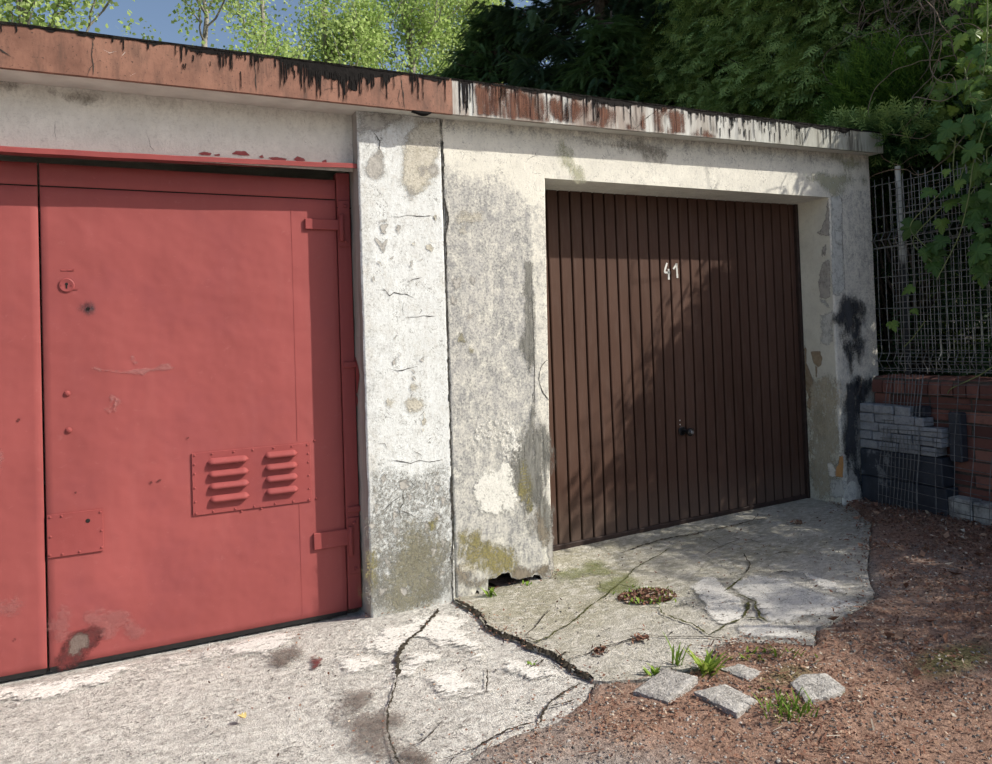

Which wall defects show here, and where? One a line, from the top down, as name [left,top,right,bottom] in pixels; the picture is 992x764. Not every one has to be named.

rust [474,83,712,137]
peeling [366,150,384,179]
flaking render [402,120,443,200]
leakage [519,261,536,373]
flaking render [804,203,833,409]
leakage [843,318,872,402]
crack [379,119,793,764]
leakage [808,376,850,499]
leakage [458,530,483,554]
leakage [511,564,552,579]